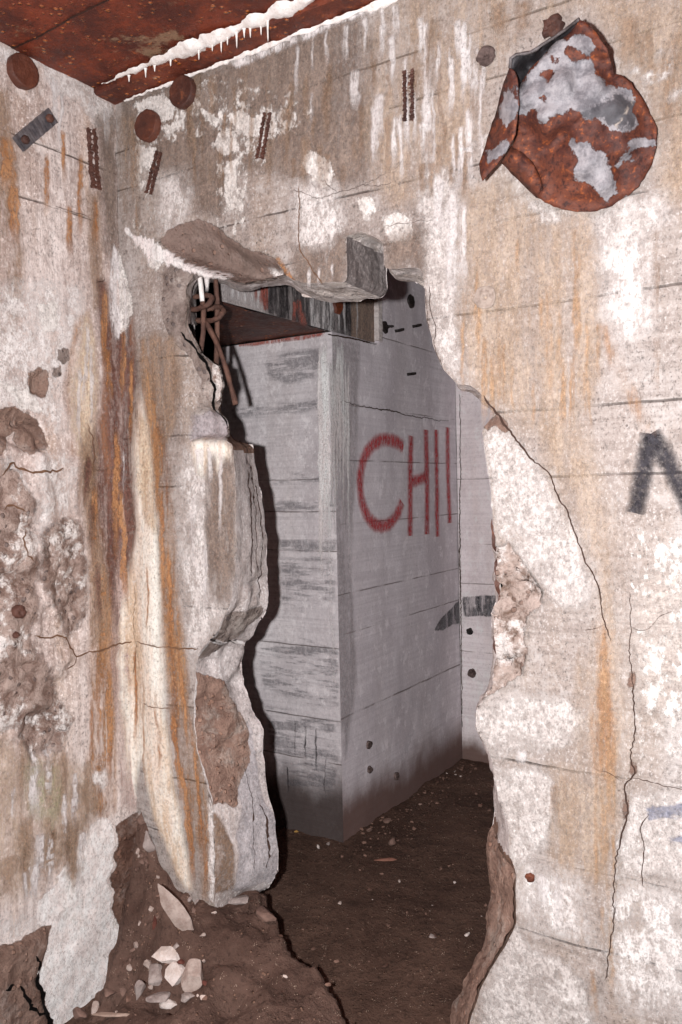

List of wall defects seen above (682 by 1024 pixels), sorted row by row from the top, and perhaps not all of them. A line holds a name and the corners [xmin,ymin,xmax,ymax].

leakage [0,46,15,62]
corrosion [0,92,20,231]
spalling [0,406,89,760]
crack [35,584,197,673]
corrosion [80,282,211,884]
crack [181,332,227,425]
leakage [179,411,236,655]
spalling [129,77,424,908]
leakage [28,0,682,609]
spalling [450,543,541,1024]
crack [345,394,682,977]
corrosion [599,634,614,787]